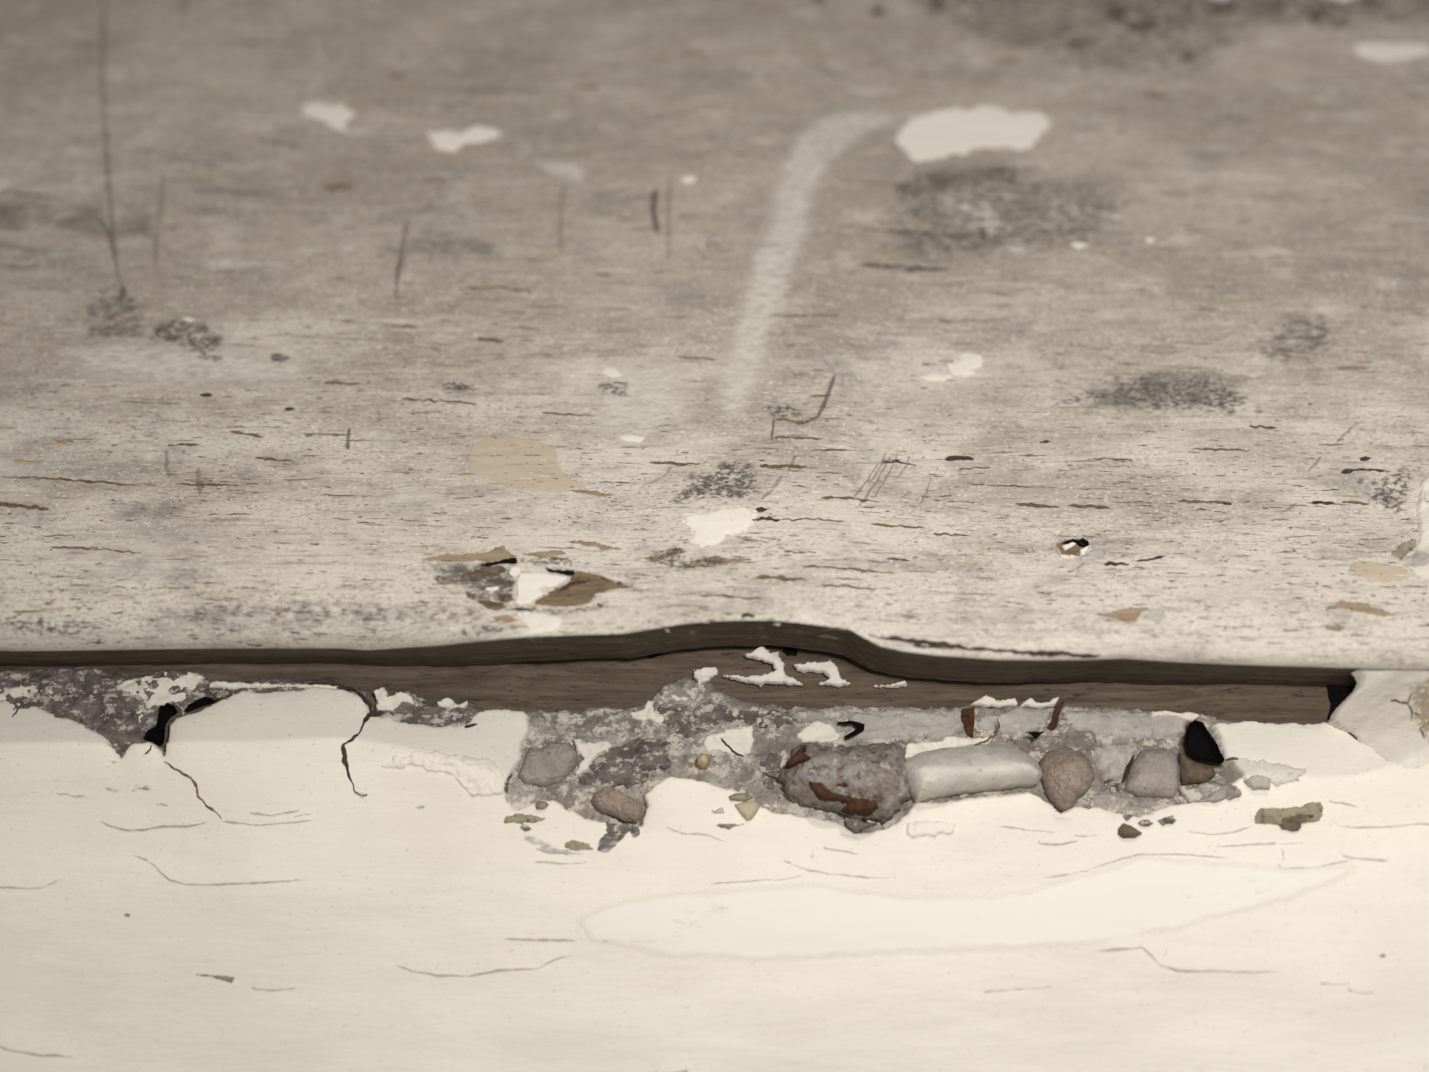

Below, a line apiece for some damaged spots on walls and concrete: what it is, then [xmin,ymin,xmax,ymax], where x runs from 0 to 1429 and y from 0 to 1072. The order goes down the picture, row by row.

leakage [864,166,1115,255]
peeling [570,540,623,550]
peeling [486,566,571,607]
crack [112,745,222,819]
peeling [0,667,480,758]
crack [307,682,412,796]
crack [721,738,779,783]
peeling [381,646,1309,864]
crack [973,718,1000,746]
crack [1122,754,1135,782]
crack [1390,692,1429,738]
peeling [1038,802,1323,878]